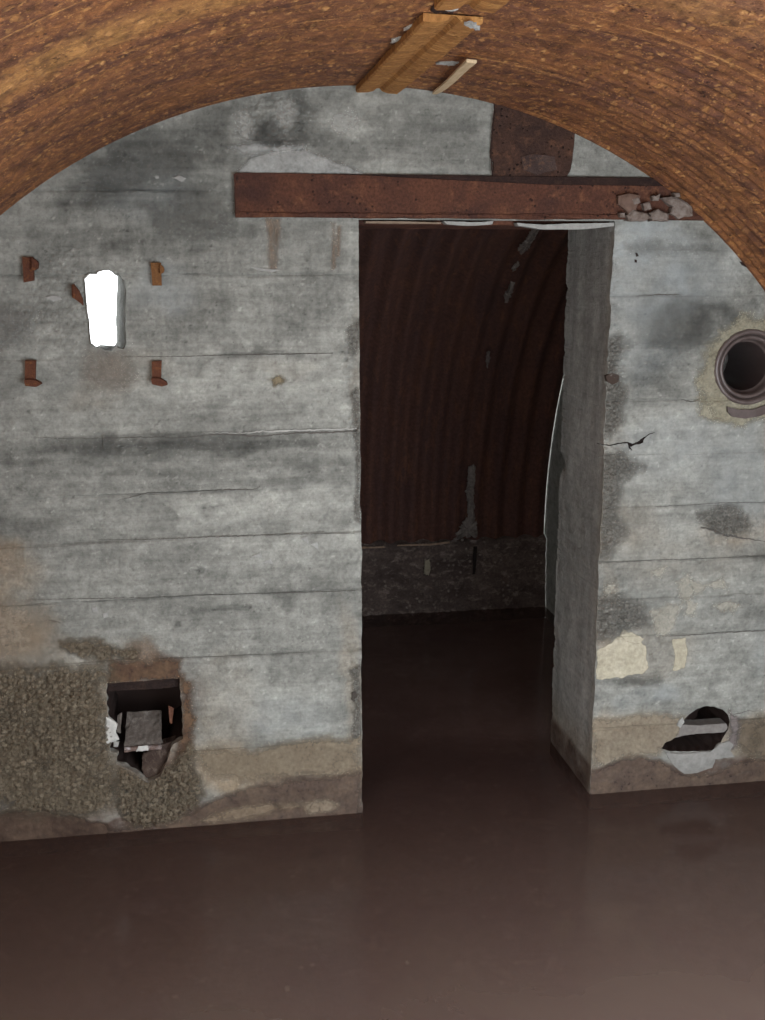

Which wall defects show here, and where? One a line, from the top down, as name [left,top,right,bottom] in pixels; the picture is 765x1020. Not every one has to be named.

crack [597,432,655,457]
peeling [596,576,725,680]
spalling [0,639,204,828]